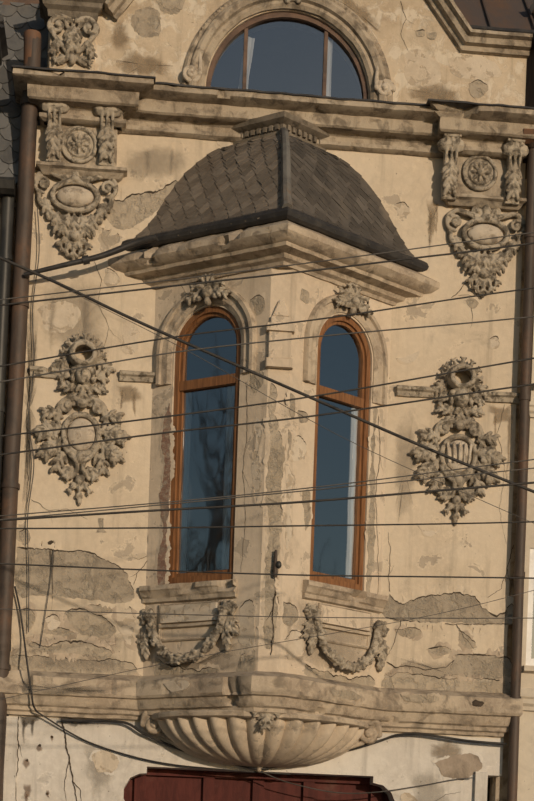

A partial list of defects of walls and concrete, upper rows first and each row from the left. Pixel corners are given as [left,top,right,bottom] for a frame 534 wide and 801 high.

flaking render [131,0,189,42]
flaking render [401,48,502,102]
flaking render [153,403,176,585]
flaking render [235,368,513,709]
flaking render [9,529,139,676]
water stain [21,716,38,734]
crack [61,721,82,801]
flaking render [430,750,486,784]